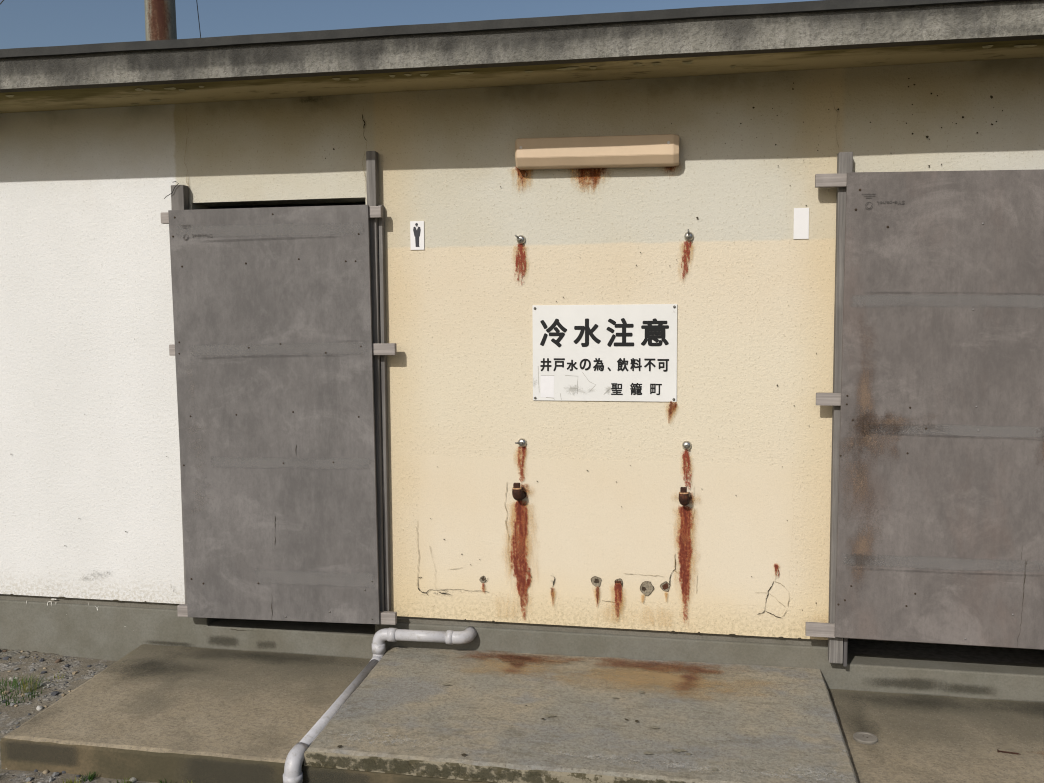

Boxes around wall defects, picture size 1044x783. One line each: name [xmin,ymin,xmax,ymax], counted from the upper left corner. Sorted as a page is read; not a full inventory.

corrosion [516,167,533,183]
corrosion [570,168,605,187]
corrosion [515,244,526,284]
corrosion [681,241,691,278]
corrosion [510,446,531,620]
corrosion [677,450,693,620]
corrosion [614,583,622,617]
crack [755,572,790,618]